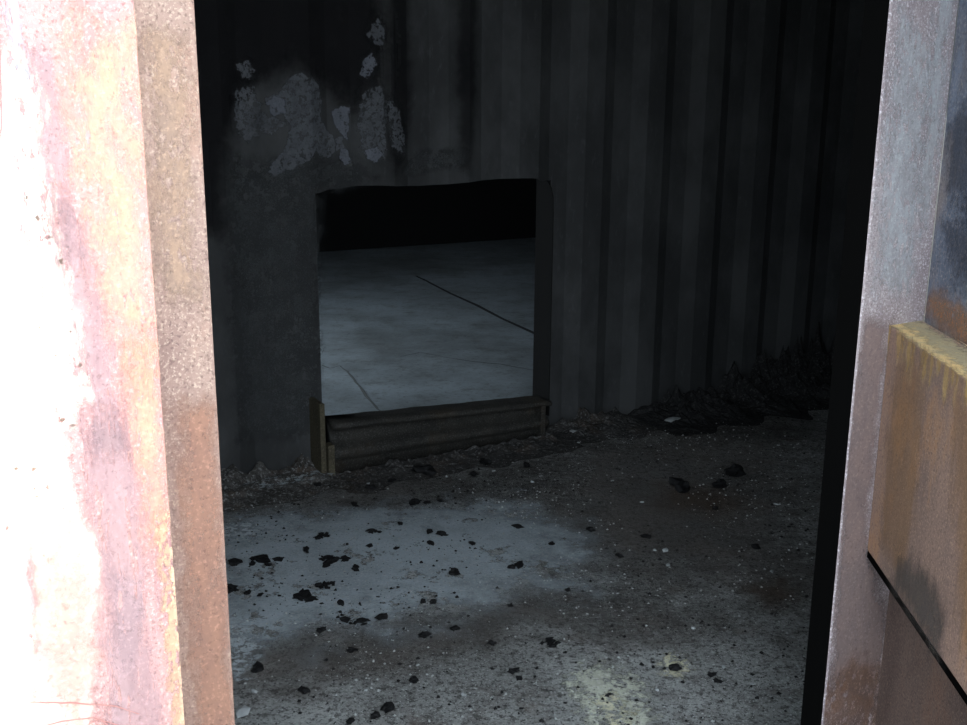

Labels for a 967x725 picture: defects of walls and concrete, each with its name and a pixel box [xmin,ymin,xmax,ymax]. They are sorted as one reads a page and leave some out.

corrosion [77,24,157,330]
peeling [233,18,406,176]
corrosion [133,344,232,725]
corrosion [824,663,877,725]